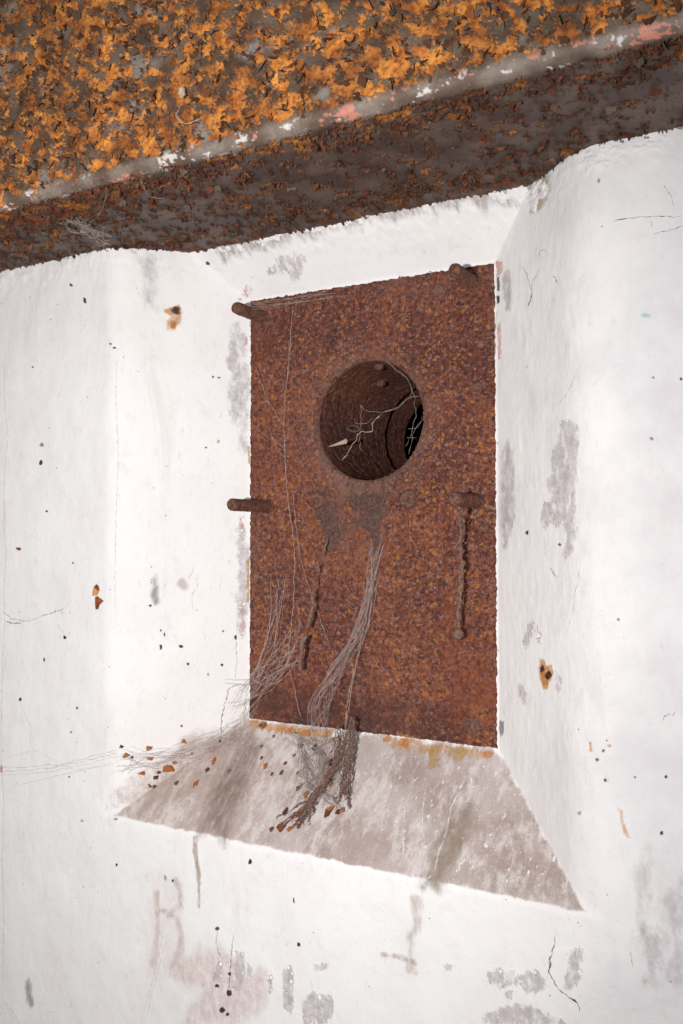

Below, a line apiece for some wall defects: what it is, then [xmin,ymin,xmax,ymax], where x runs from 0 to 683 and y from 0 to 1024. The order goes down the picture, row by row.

corrosion [0,0,683,269]
corrosion [165,305,181,329]
corrosion [539,660,553,689]
corrosion [249,721,333,738]
corrosion [384,735,493,768]
crack [548,937,580,1010]